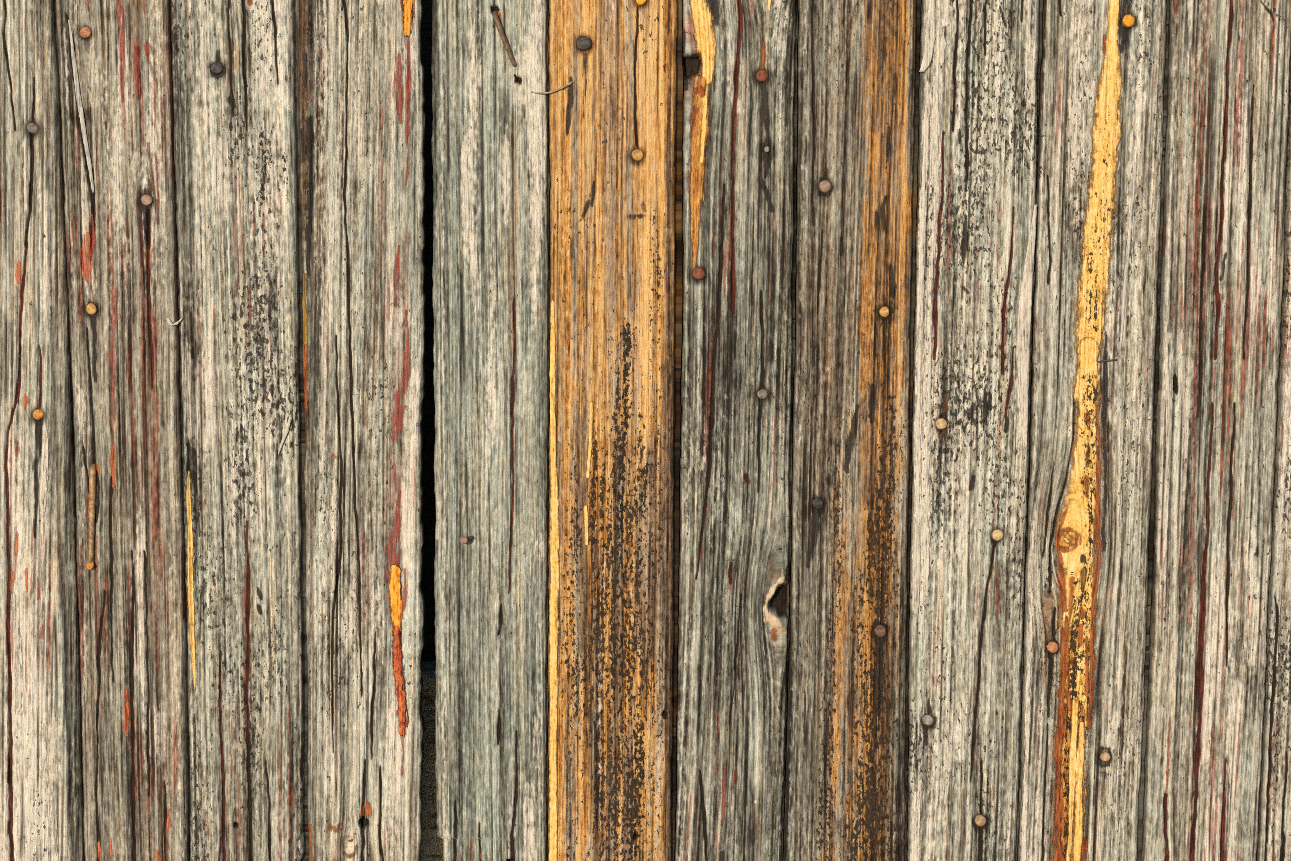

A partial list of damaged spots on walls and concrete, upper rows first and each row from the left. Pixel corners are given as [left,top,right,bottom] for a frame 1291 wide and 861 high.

crack [66,13,95,255]
peeling [687,0,717,270]
crack [0,0,42,861]
rust [86,460,100,523]
peeling [548,300,560,861]
peeling [1051,0,1123,861]